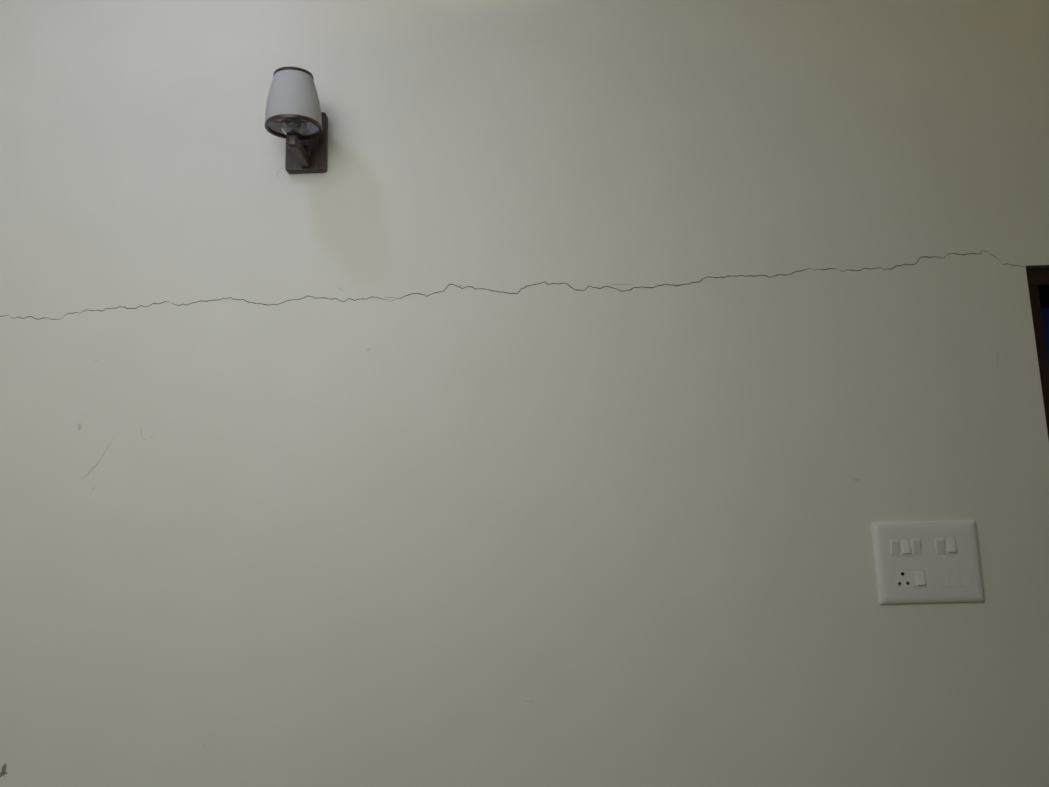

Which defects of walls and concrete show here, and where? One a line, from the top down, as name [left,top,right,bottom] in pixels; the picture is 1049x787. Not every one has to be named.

crack [0,251,1023,320]